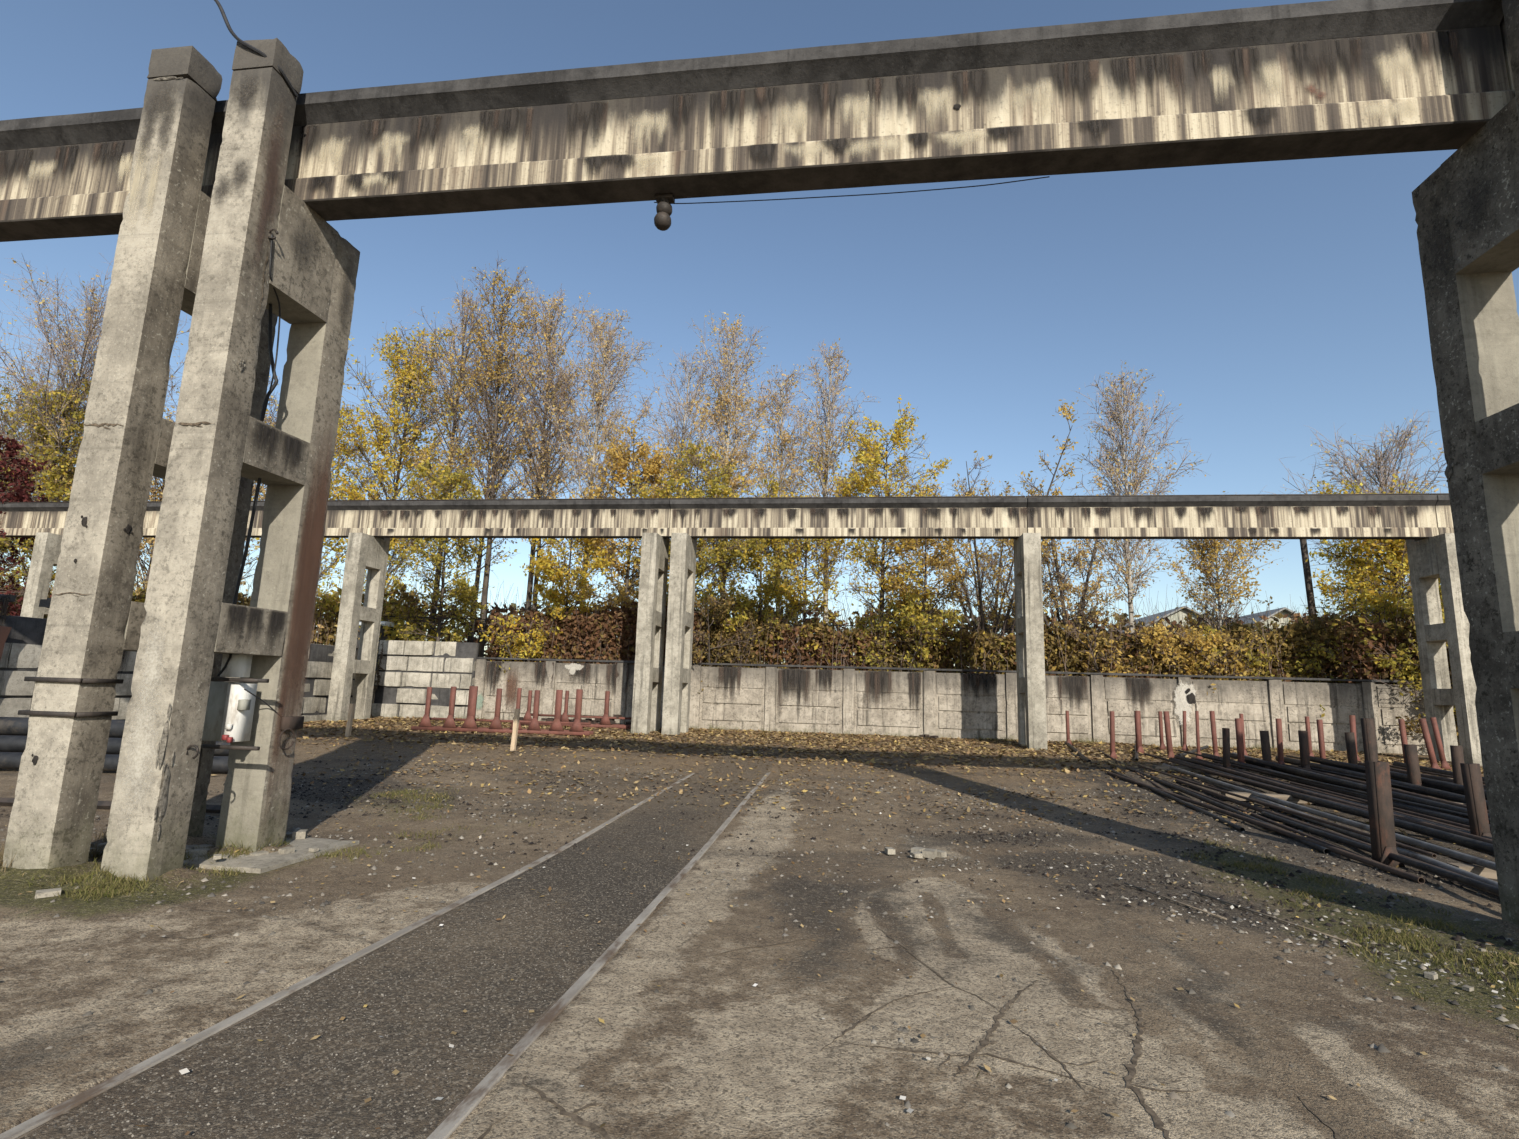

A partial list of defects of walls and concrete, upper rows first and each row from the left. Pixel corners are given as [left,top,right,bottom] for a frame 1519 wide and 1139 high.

leakage [1039,38,1361,108]
leakage [584,87,778,172]
leakage [786,69,1019,154]
leakage [1079,119,1110,137]
leakage [1247,107,1274,126]
rust [275,482,326,749]
leakage [535,662,629,692]
leakage [719,666,741,690]
leakage [778,668,832,702]
leakage [865,671,921,705]
leakage [1127,677,1150,708]
crack [821,924,1199,1139]